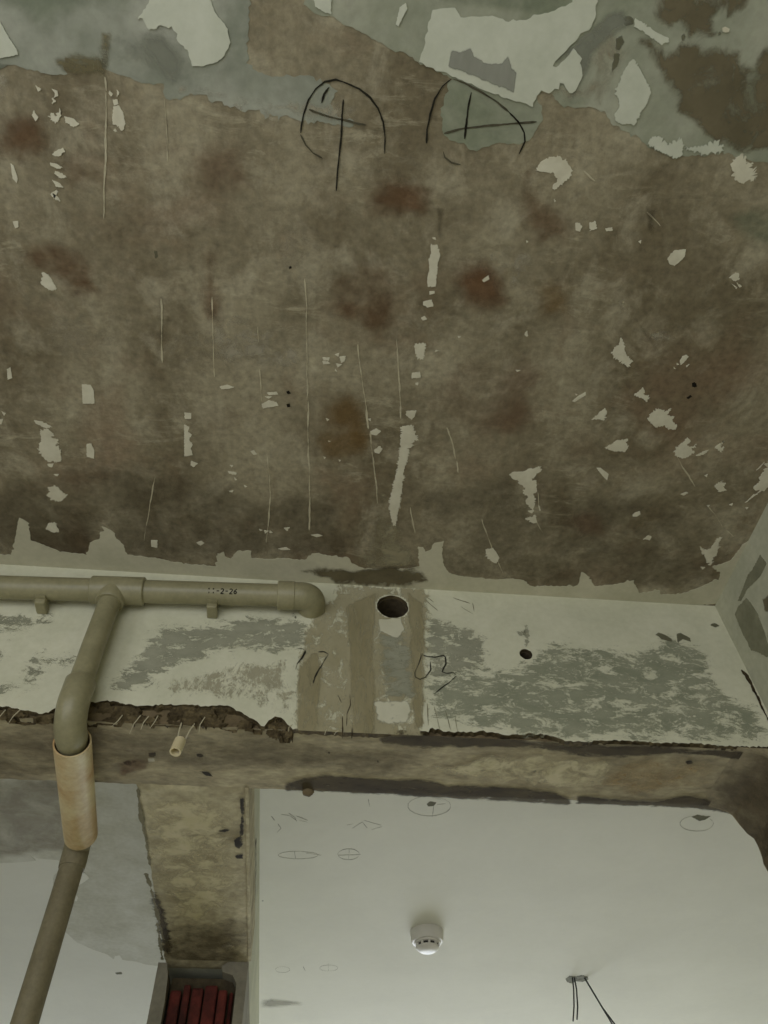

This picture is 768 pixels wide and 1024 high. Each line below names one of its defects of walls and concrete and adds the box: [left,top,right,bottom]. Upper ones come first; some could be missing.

peeling [612,16,634,71]
peeling [32,85,79,127]
peeling [109,90,126,132]
flaking render [0,518,748,605]
spalling [0,708,55,726]
spalling [87,702,294,743]
leakage [441,756,608,786]
leakage [150,802,229,920]